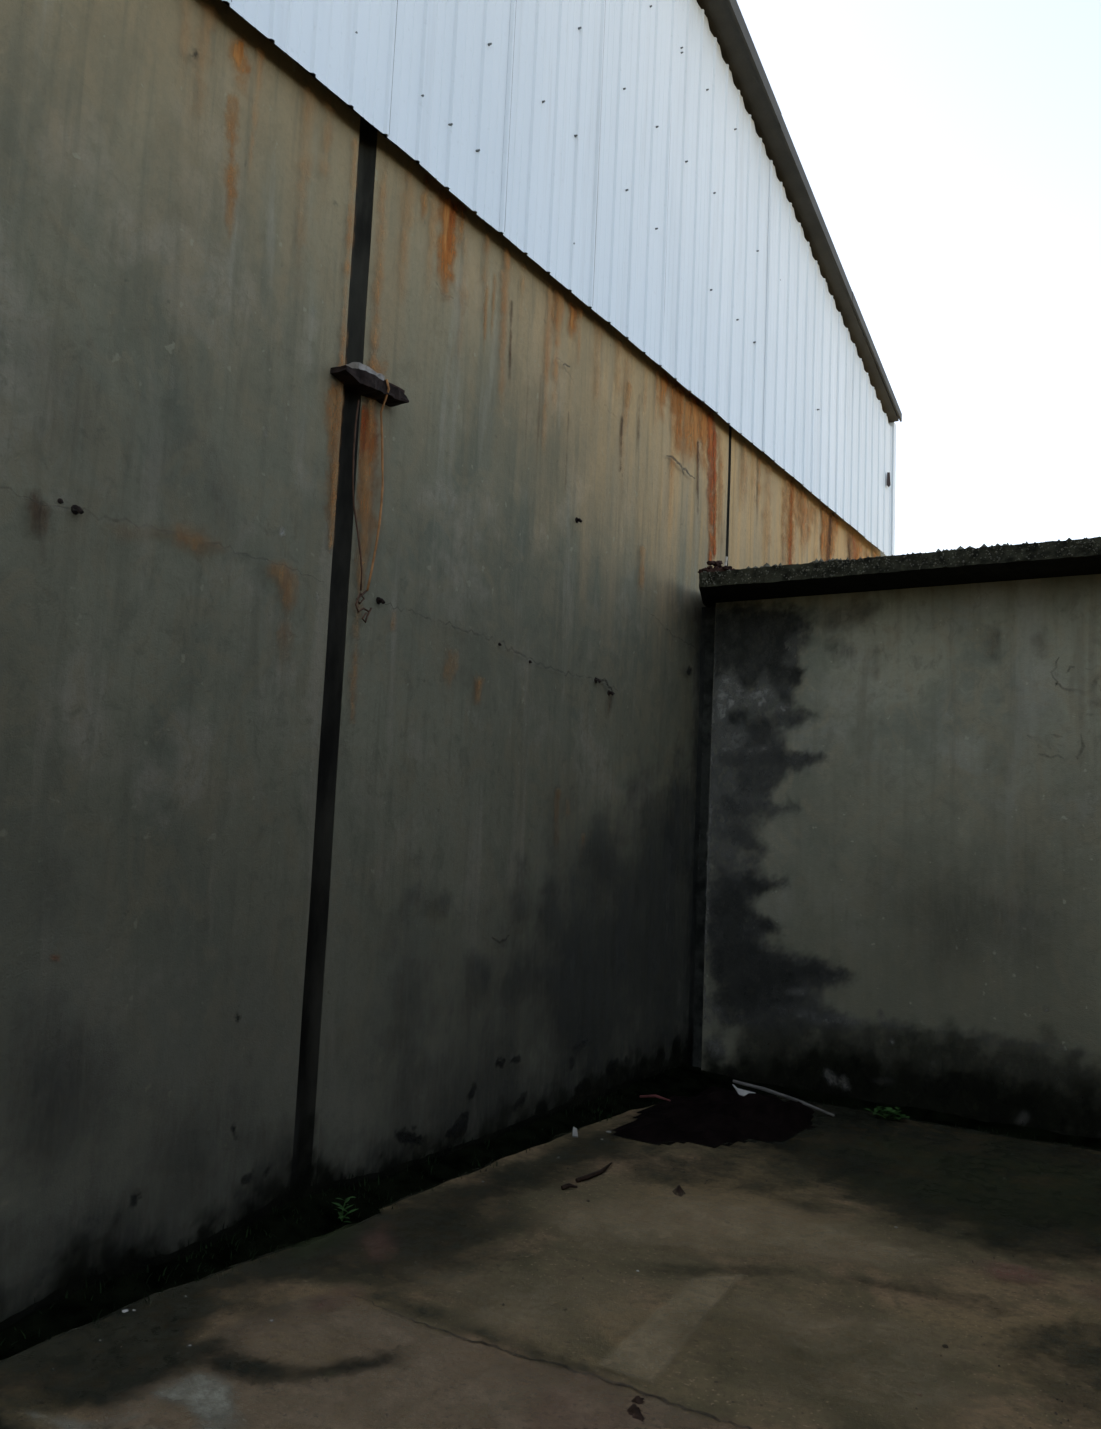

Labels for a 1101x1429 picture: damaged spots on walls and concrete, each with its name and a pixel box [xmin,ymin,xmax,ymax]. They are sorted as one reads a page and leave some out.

corrosion [422,174,466,284]
corrosion [328,385,342,548]
corrosion [358,397,377,607]
corrosion [658,373,723,561]
corrosion [767,484,876,564]
damp [706,604,860,1035]
damp [0,1094,1101,1429]